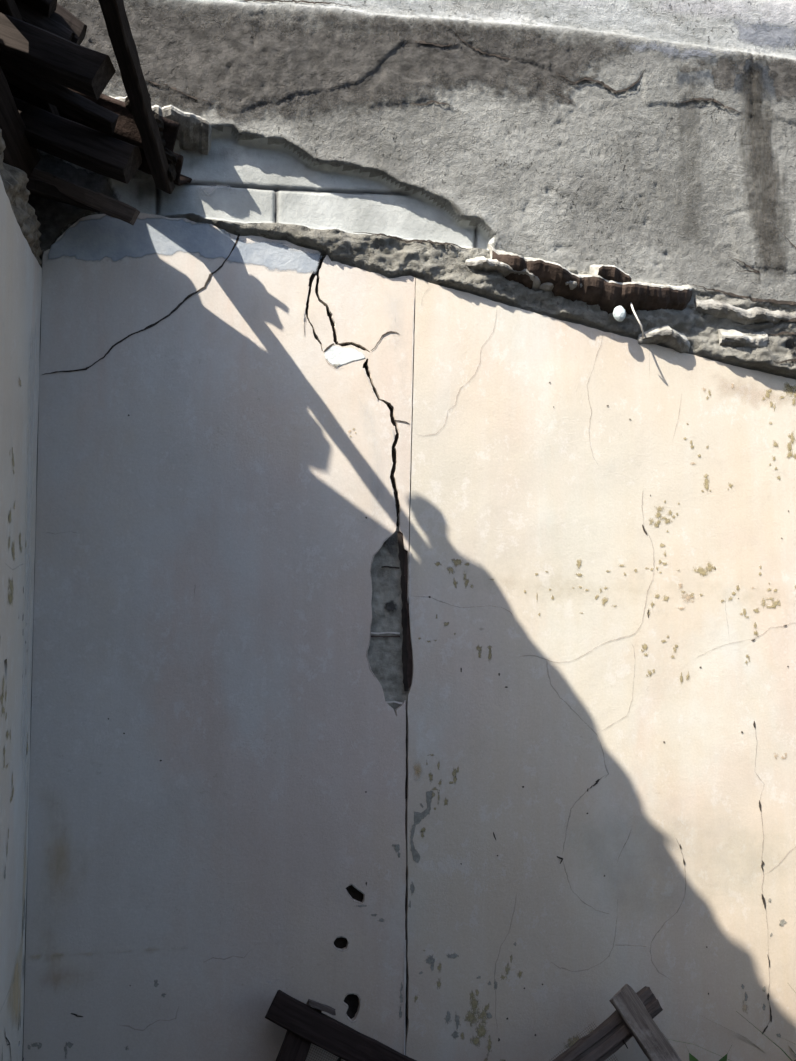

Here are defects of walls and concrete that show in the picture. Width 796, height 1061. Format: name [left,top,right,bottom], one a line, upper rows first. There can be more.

water stain [57,0,127,97]
water stain [124,0,796,275]
crack [43,234,240,375]
crack [354,232,468,250]
flaking render [108,126,796,409]
crack [303,257,416,618]
peeling [769,433,796,480]
flaking render [367,527,436,715]
peeling [607,501,680,575]
peeling [721,566,780,636]
crack [402,714,410,835]
crack [402,865,410,1055]